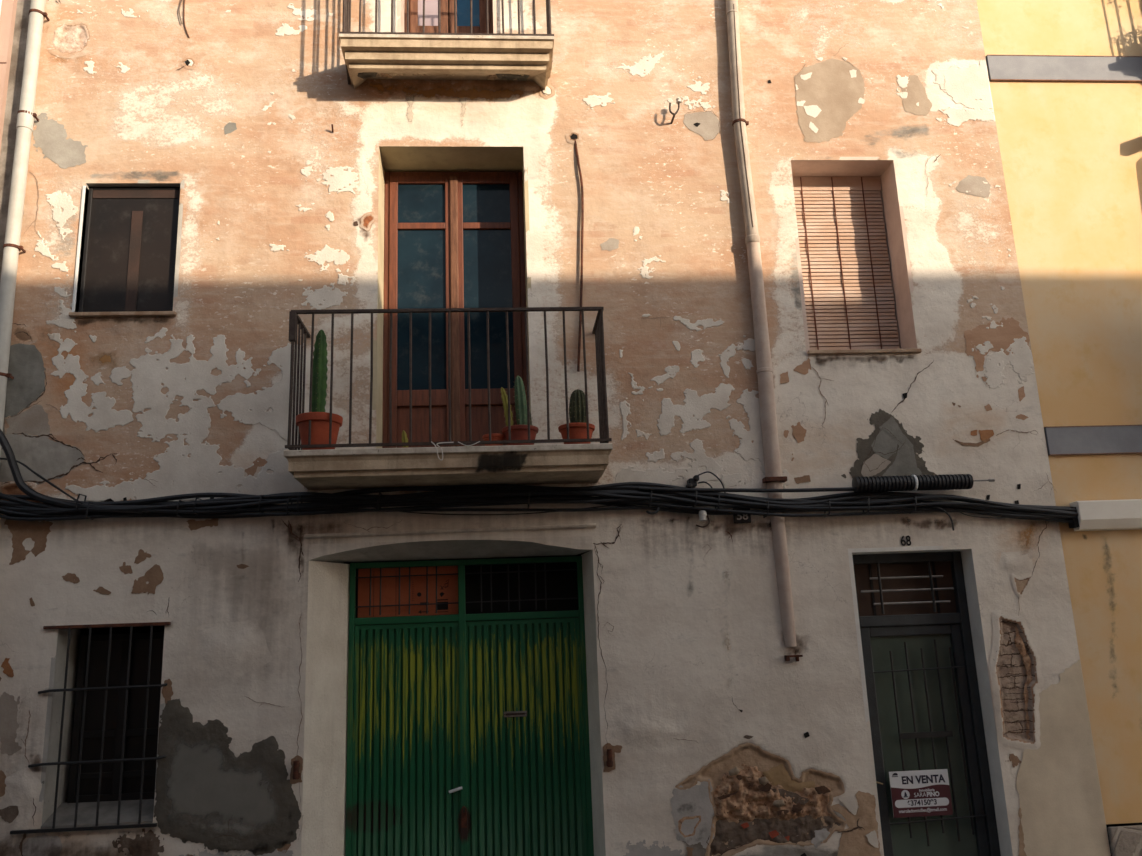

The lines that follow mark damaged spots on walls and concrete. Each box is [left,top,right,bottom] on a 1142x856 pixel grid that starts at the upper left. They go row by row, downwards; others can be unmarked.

peeling [795,72,822,133]
peeling [301,152,359,194]
peeling [298,245,356,315]
peeling [11,190,308,502]
crack [3,372,117,484]
peeling [614,335,766,488]
crack [861,360,934,471]
peeling [4,519,53,565]
peeling [119,549,164,594]
crack [593,524,623,733]
flaking render [989,573,1044,768]
flaking render [625,735,881,856]